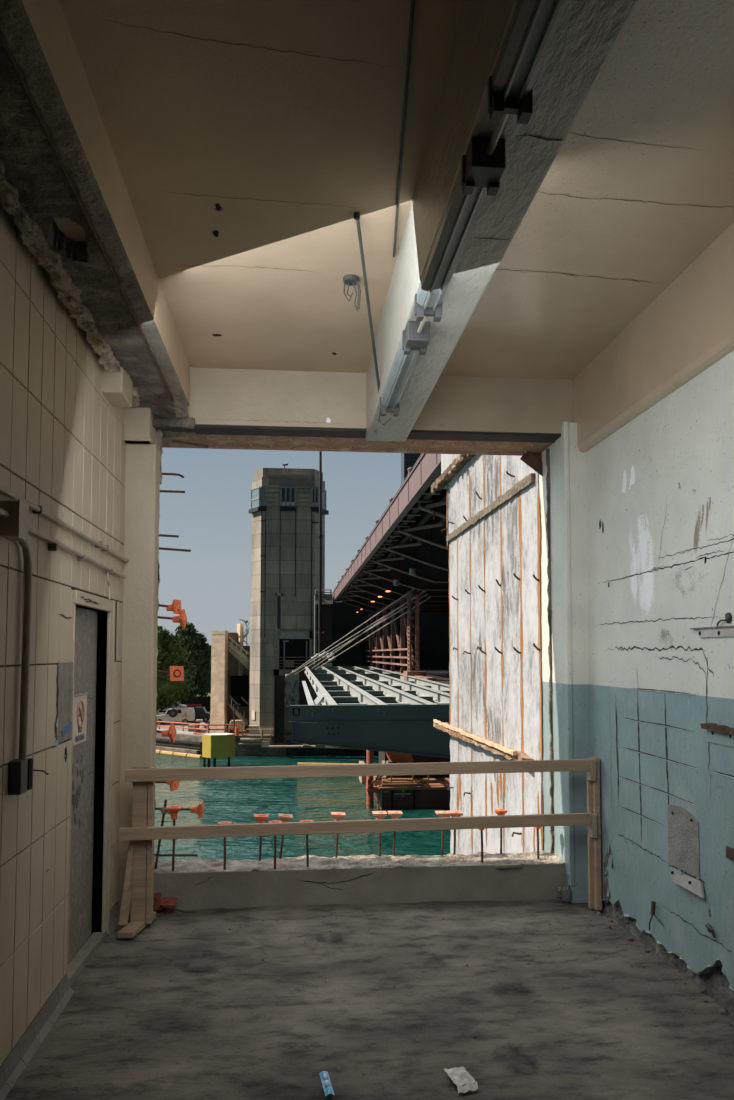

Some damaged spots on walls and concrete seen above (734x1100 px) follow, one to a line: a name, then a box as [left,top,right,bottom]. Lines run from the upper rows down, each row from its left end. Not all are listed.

crack [518,133,704,151]
crack [496,269,650,283]
rust [446,455,506,816]
crack [598,504,734,784]
rust [522,773,543,852]
spalling [594,844,734,1027]